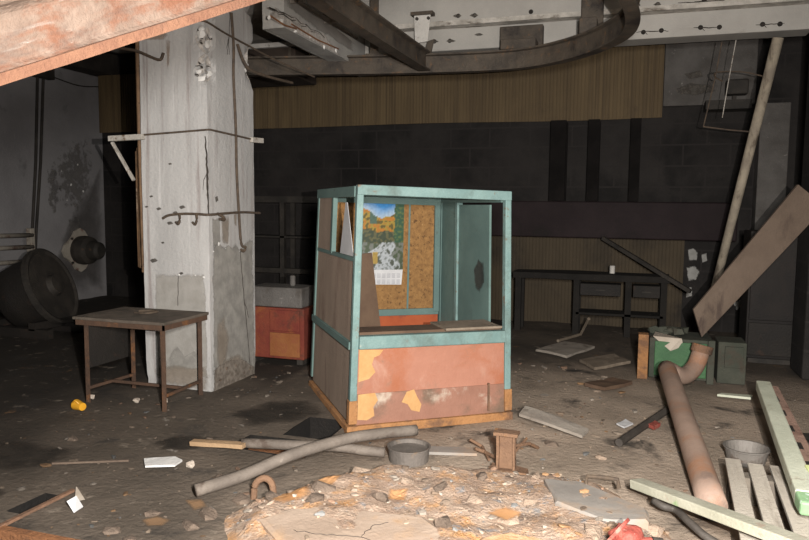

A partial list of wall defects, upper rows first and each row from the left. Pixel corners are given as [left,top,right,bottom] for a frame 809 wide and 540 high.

spalling [195,23,212,82]